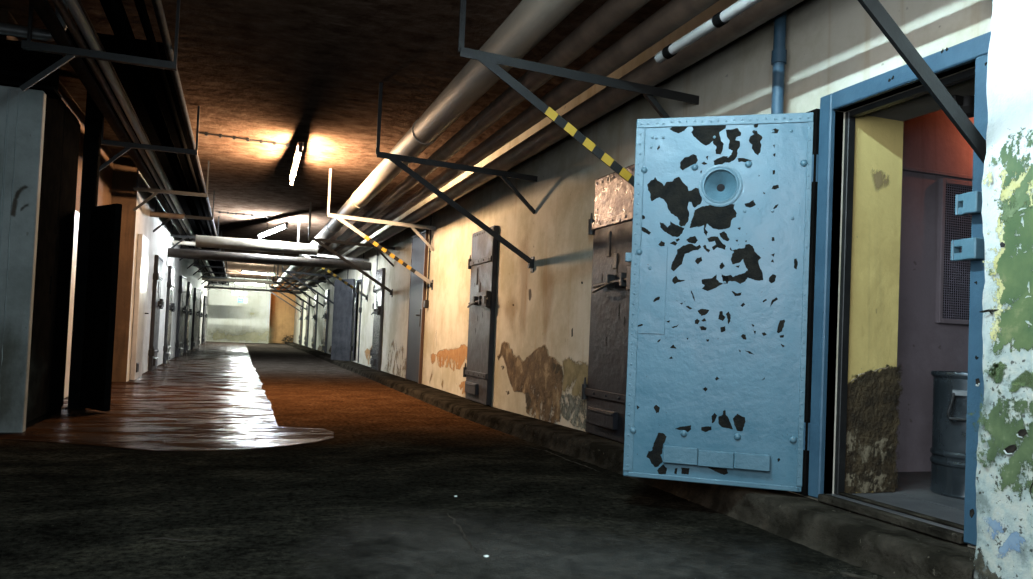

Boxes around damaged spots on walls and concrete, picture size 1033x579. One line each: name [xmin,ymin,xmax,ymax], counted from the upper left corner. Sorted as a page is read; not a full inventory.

peeling [642,124,779,342]
flaking render [430,344,468,394]
flaking render [497,341,588,431]
peeling [739,320,785,354]
peeling [968,127,1033,508]
flaking render [968,547,1002,579]